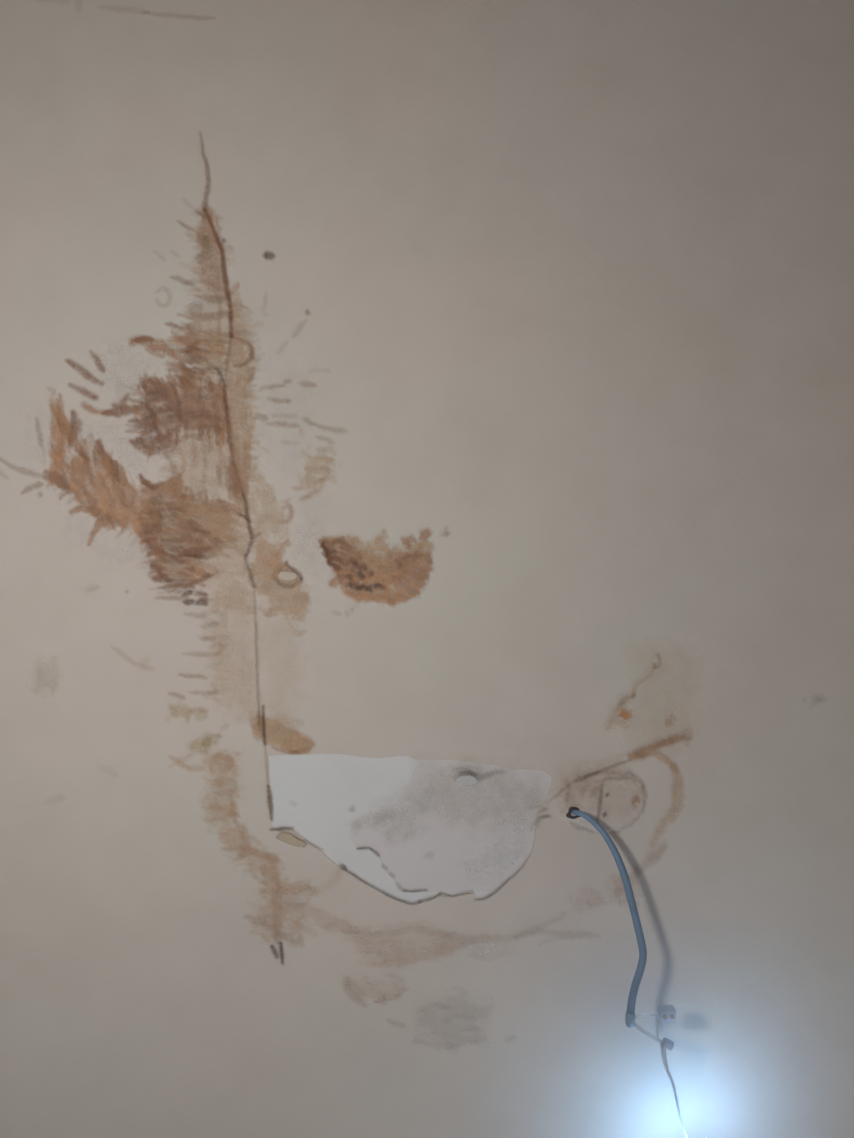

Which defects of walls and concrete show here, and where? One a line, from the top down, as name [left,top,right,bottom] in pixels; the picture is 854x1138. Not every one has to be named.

crack [204,210,232,337]
damp [50,317,308,615]
crack [266,786,274,820]
damp [254,717,312,754]
peeling [269,754,552,910]
damp [629,730,691,770]